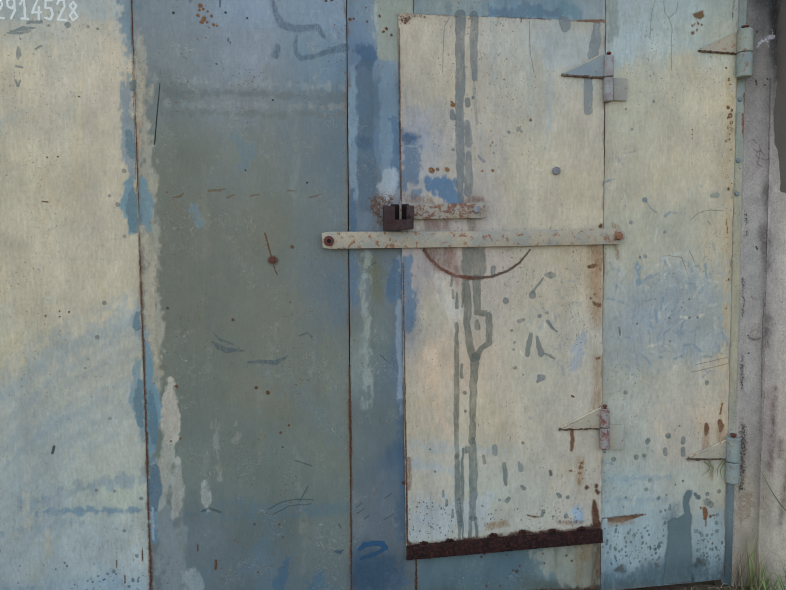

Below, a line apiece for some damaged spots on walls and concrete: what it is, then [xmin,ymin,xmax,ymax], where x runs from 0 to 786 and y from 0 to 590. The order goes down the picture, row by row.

peeling [129,58,145,121]
corrosion [382,14,428,169]
peeling [126,188,159,377]
corrosion [402,264,646,546]
corrosion [704,403,724,435]